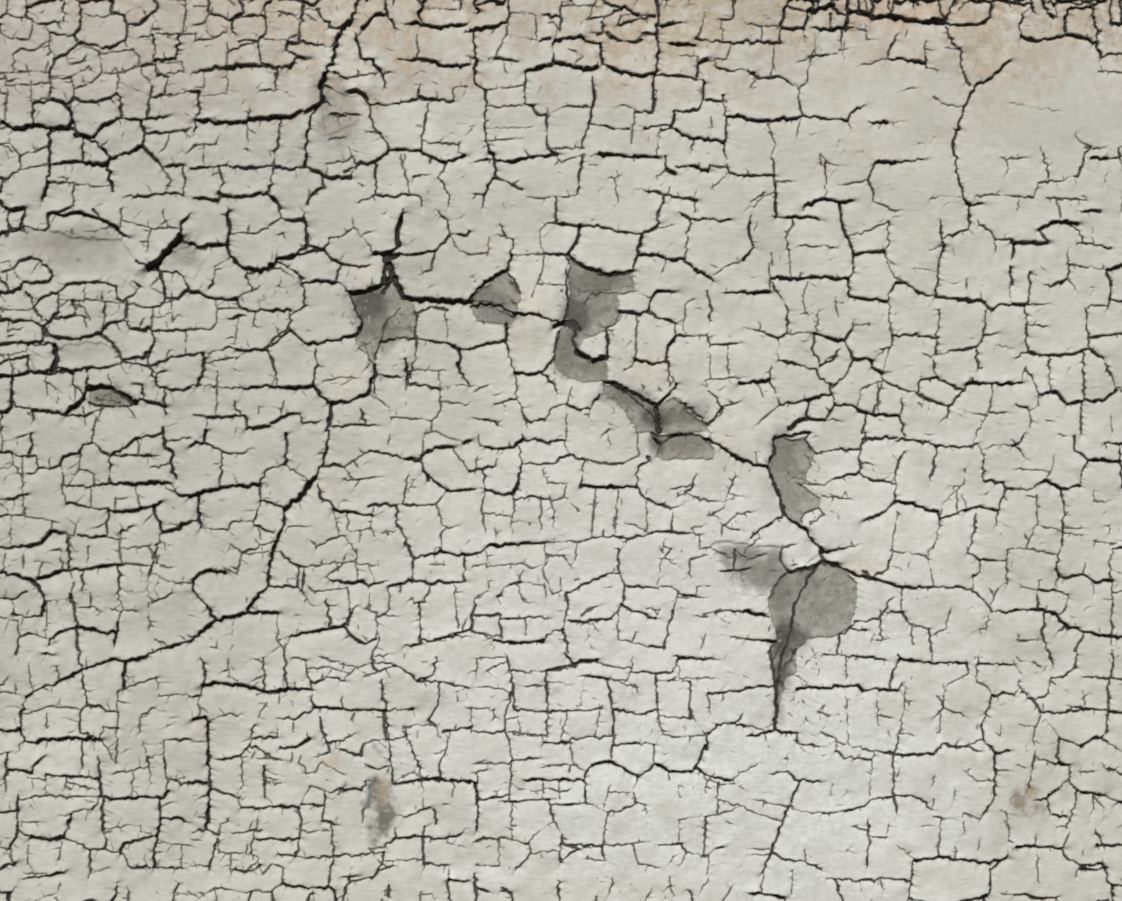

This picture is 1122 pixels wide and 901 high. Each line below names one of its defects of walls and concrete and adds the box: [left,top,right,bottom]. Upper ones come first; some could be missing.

crack [861,29,938,75]
crack [868,119,898,130]
crack [1079,208,1101,218]
peeling [347,282,420,369]
peeling [466,268,525,333]
peeling [550,253,720,464]
crack [670,466,753,537]
peeling [766,432,824,528]
crack [696,608,772,632]
peeling [699,537,862,734]
crack [658,818,693,866]
crack [999,891,1059,901]